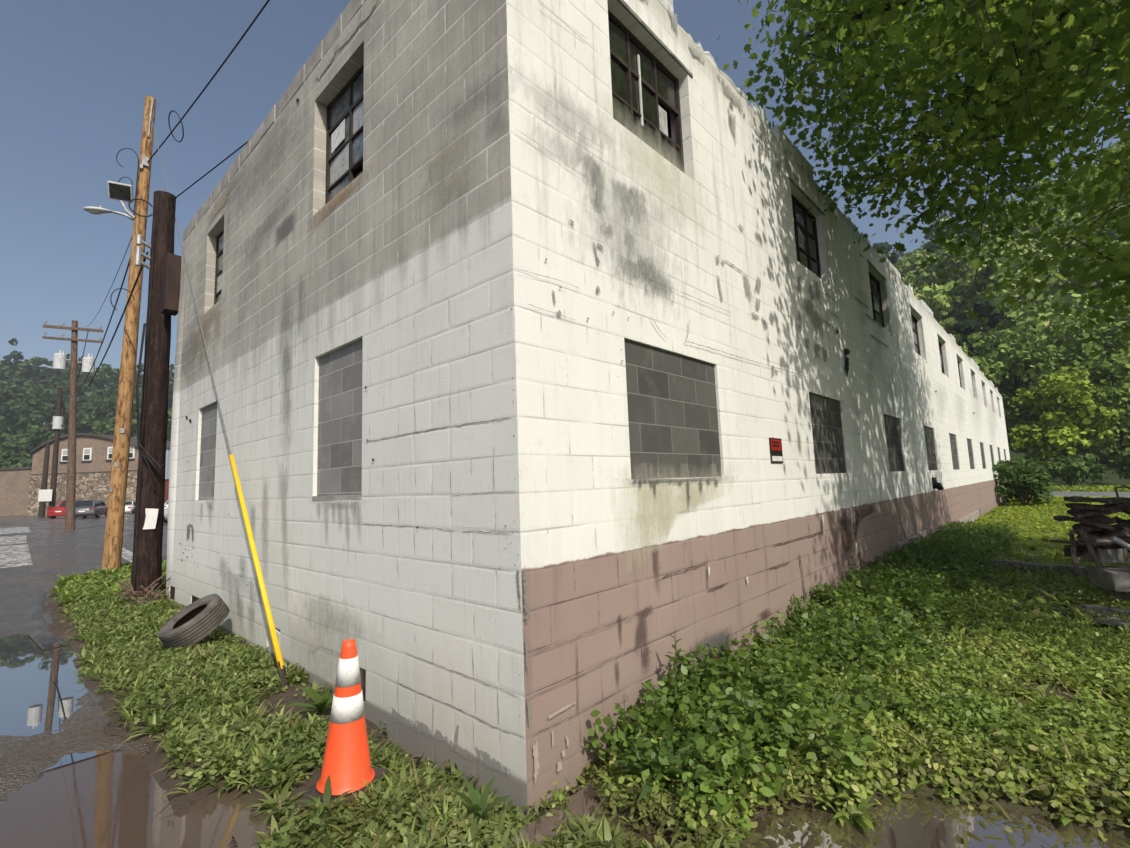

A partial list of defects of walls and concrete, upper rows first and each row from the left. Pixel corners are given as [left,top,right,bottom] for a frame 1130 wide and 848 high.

leakage [277,214,293,242]
leakage [585,157,670,292]
peeling [716,255,767,330]
peeling [783,251,827,361]
leakage [634,477,719,505]
leakage [835,506,874,563]
leakage [637,608,650,667]